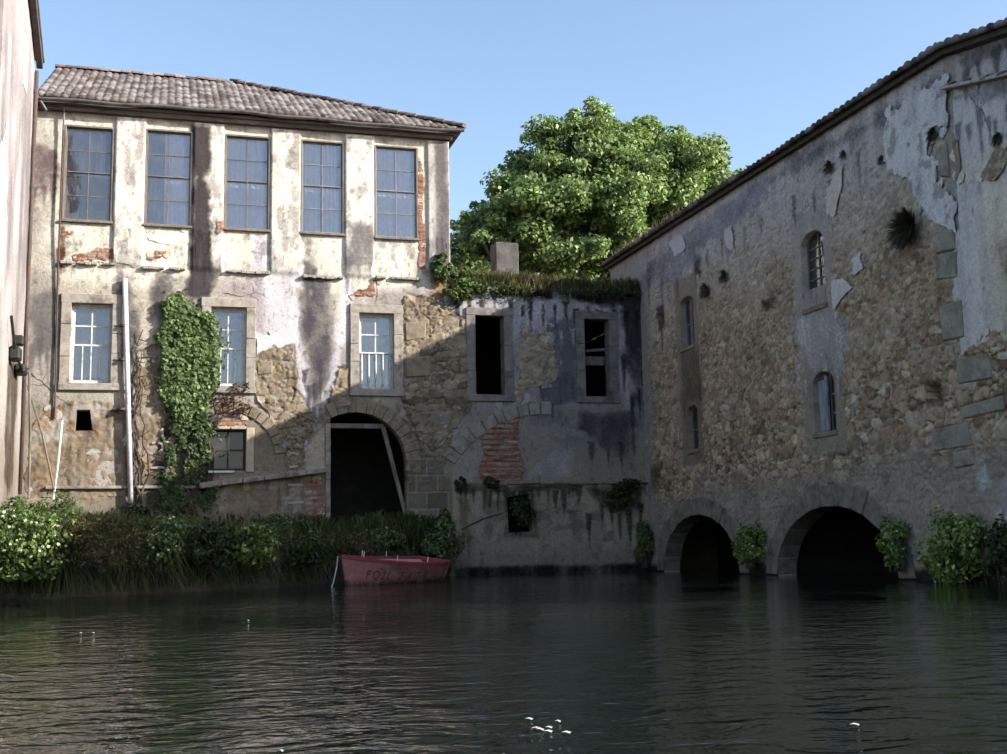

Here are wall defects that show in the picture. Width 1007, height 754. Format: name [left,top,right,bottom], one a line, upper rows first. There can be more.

flaking render [73,247,115,267]
flaking render [418,156,430,272]
flaking render [255,330,351,457]
damp [302,261,338,425]
flaking render [397,294,475,452]
flaking render [478,327,563,486]
damp [452,289,643,461]
damp [656,305,664,347]
flaking render [958,324,1007,360]